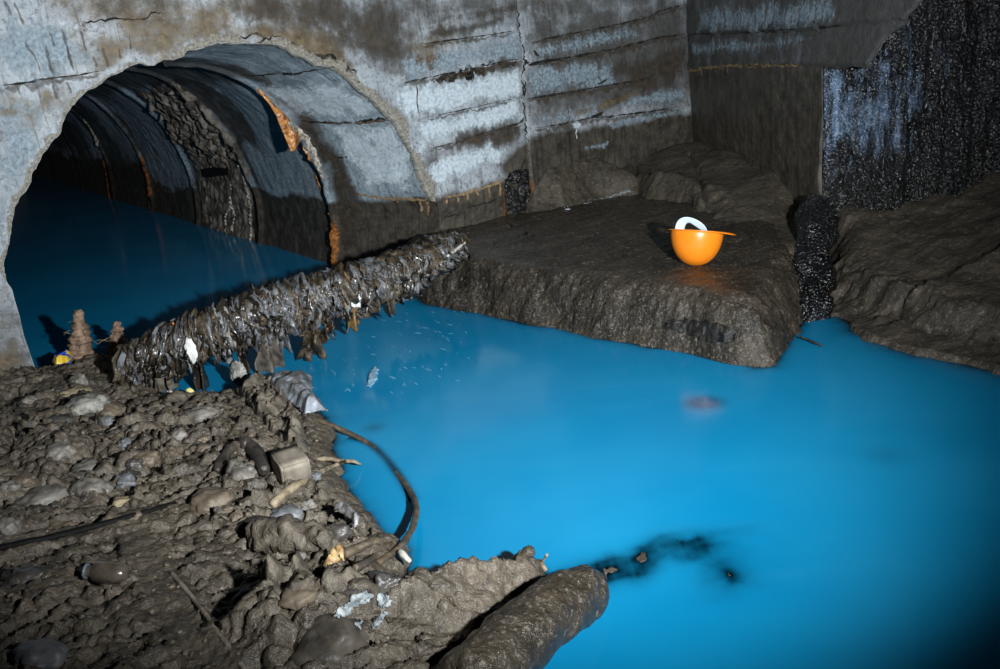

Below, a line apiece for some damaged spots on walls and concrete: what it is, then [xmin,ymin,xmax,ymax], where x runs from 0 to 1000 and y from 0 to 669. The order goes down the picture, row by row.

crack [81,11,163,25]
rust [257,89,339,268]
damp [151,0,834,242]
crack [511,1,529,145]